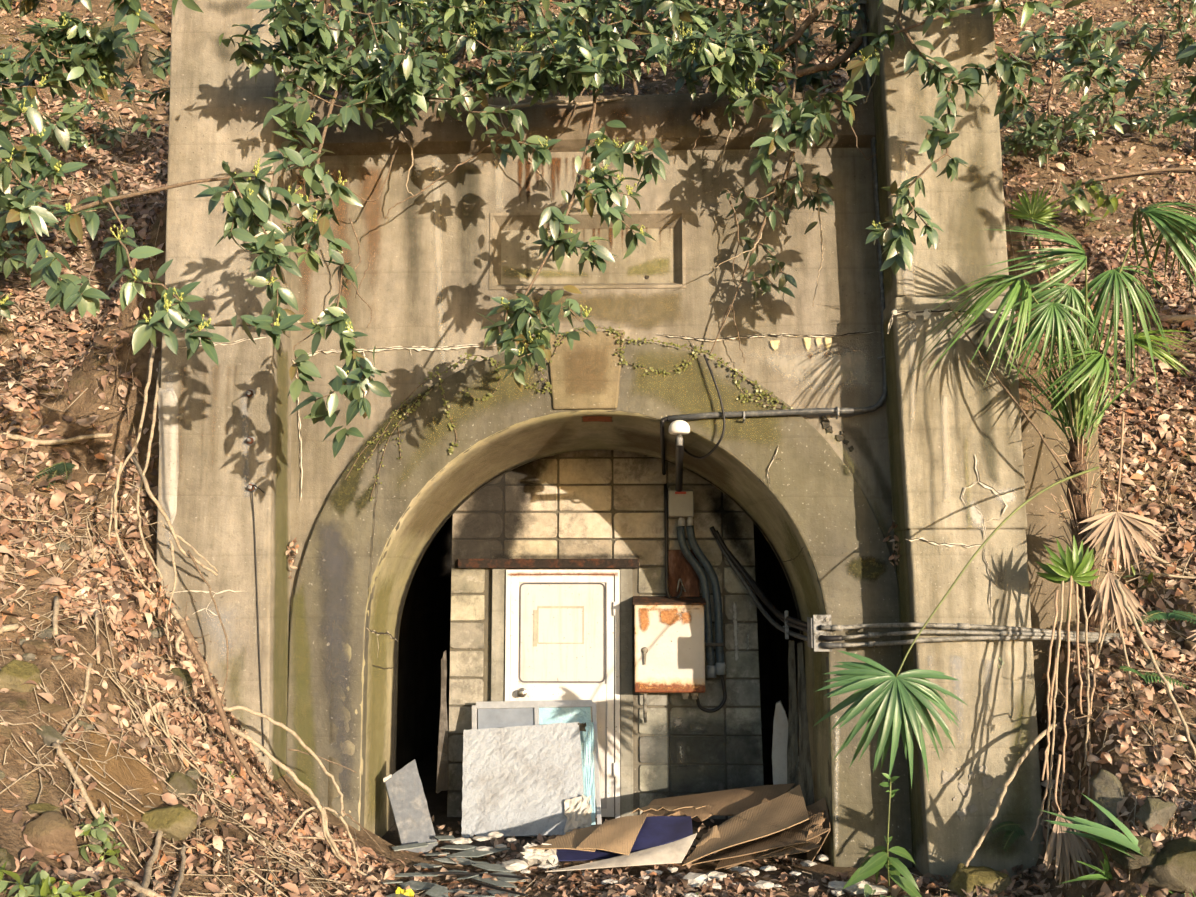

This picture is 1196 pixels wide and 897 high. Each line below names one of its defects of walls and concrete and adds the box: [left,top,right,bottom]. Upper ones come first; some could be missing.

rust [518,157,591,200]
crack [906,453,1016,617]
damp [319,526,352,795]